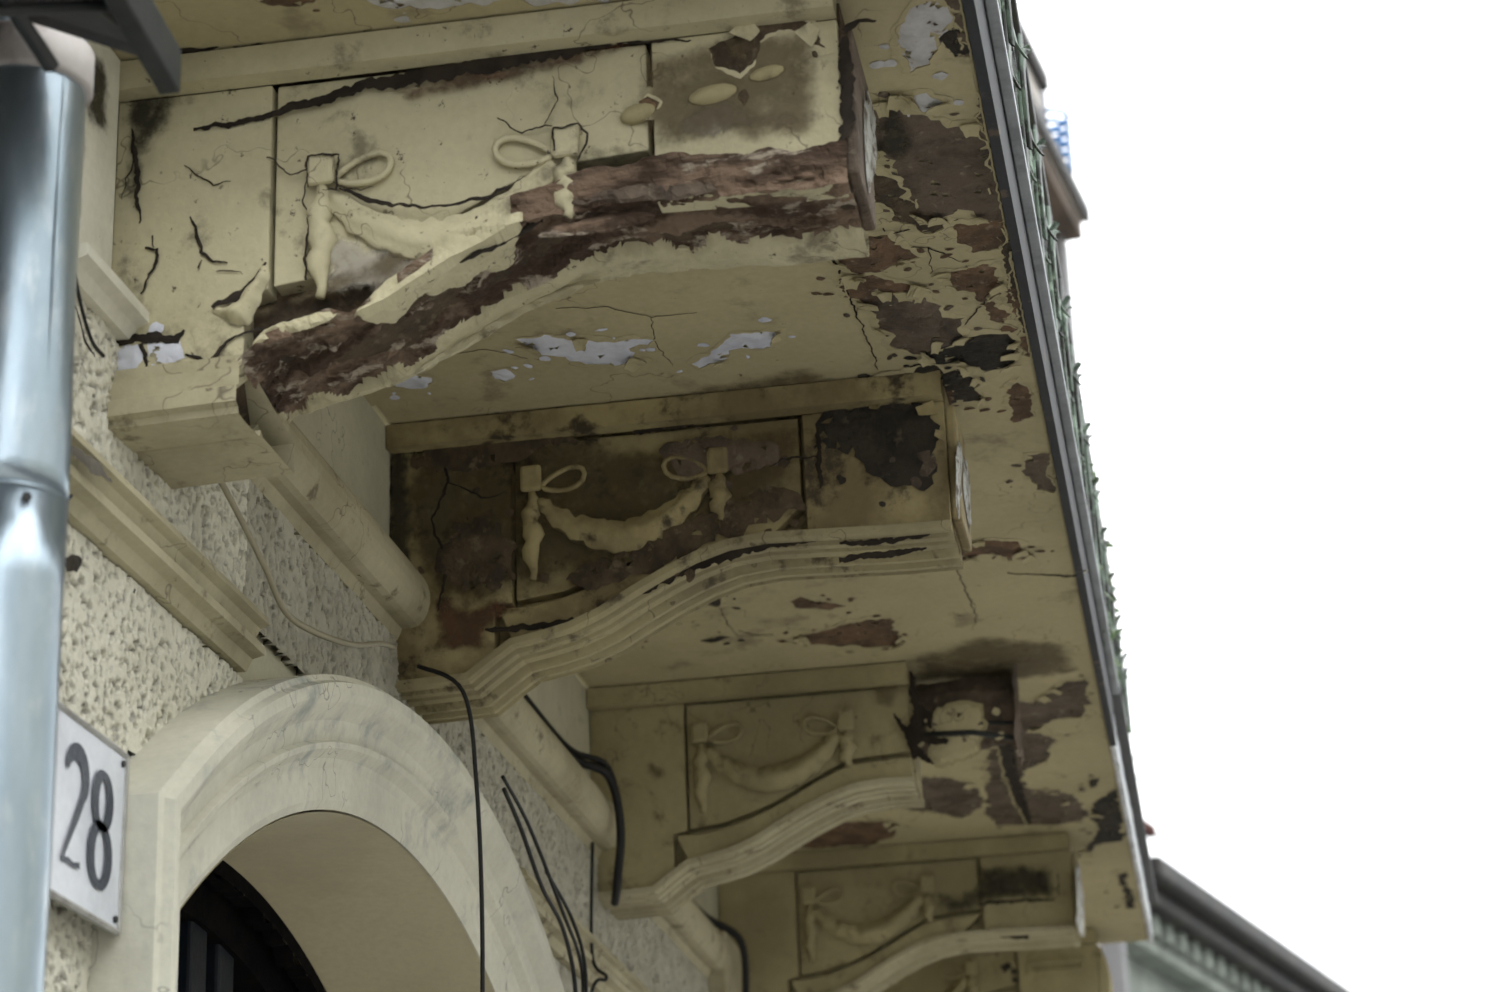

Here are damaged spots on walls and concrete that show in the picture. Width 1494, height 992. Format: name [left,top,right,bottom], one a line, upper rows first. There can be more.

crack [180,38,691,186]
water stain [647,39,809,137]
crack [76,129,509,367]
crack [428,219,543,283]
crack [556,306,692,365]
spalling [237,0,1058,565]
spalling [538,426,807,592]
spalling [697,632,745,645]
spalling [773,594,914,653]
spalling [800,675,1127,938]